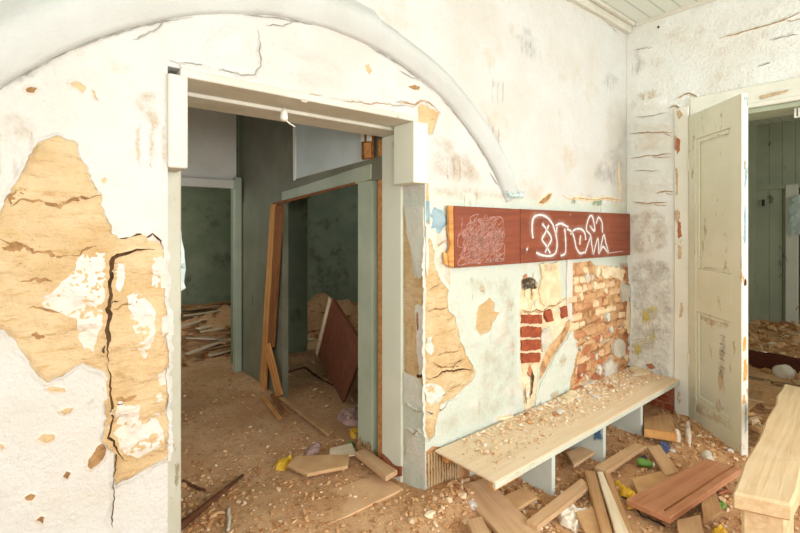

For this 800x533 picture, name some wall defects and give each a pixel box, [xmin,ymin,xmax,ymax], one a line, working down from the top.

crack [170,15,312,80]
crack [718,11,800,42]
spalling [22,85,39,95]
spalling [66,79,99,101]
spalling [416,104,440,136]
crack [563,91,699,206]
spalling [0,132,175,490]
spalling [403,170,476,442]
spalling [474,296,500,336]
flaking render [517,258,631,411]
crack [99,229,164,527]